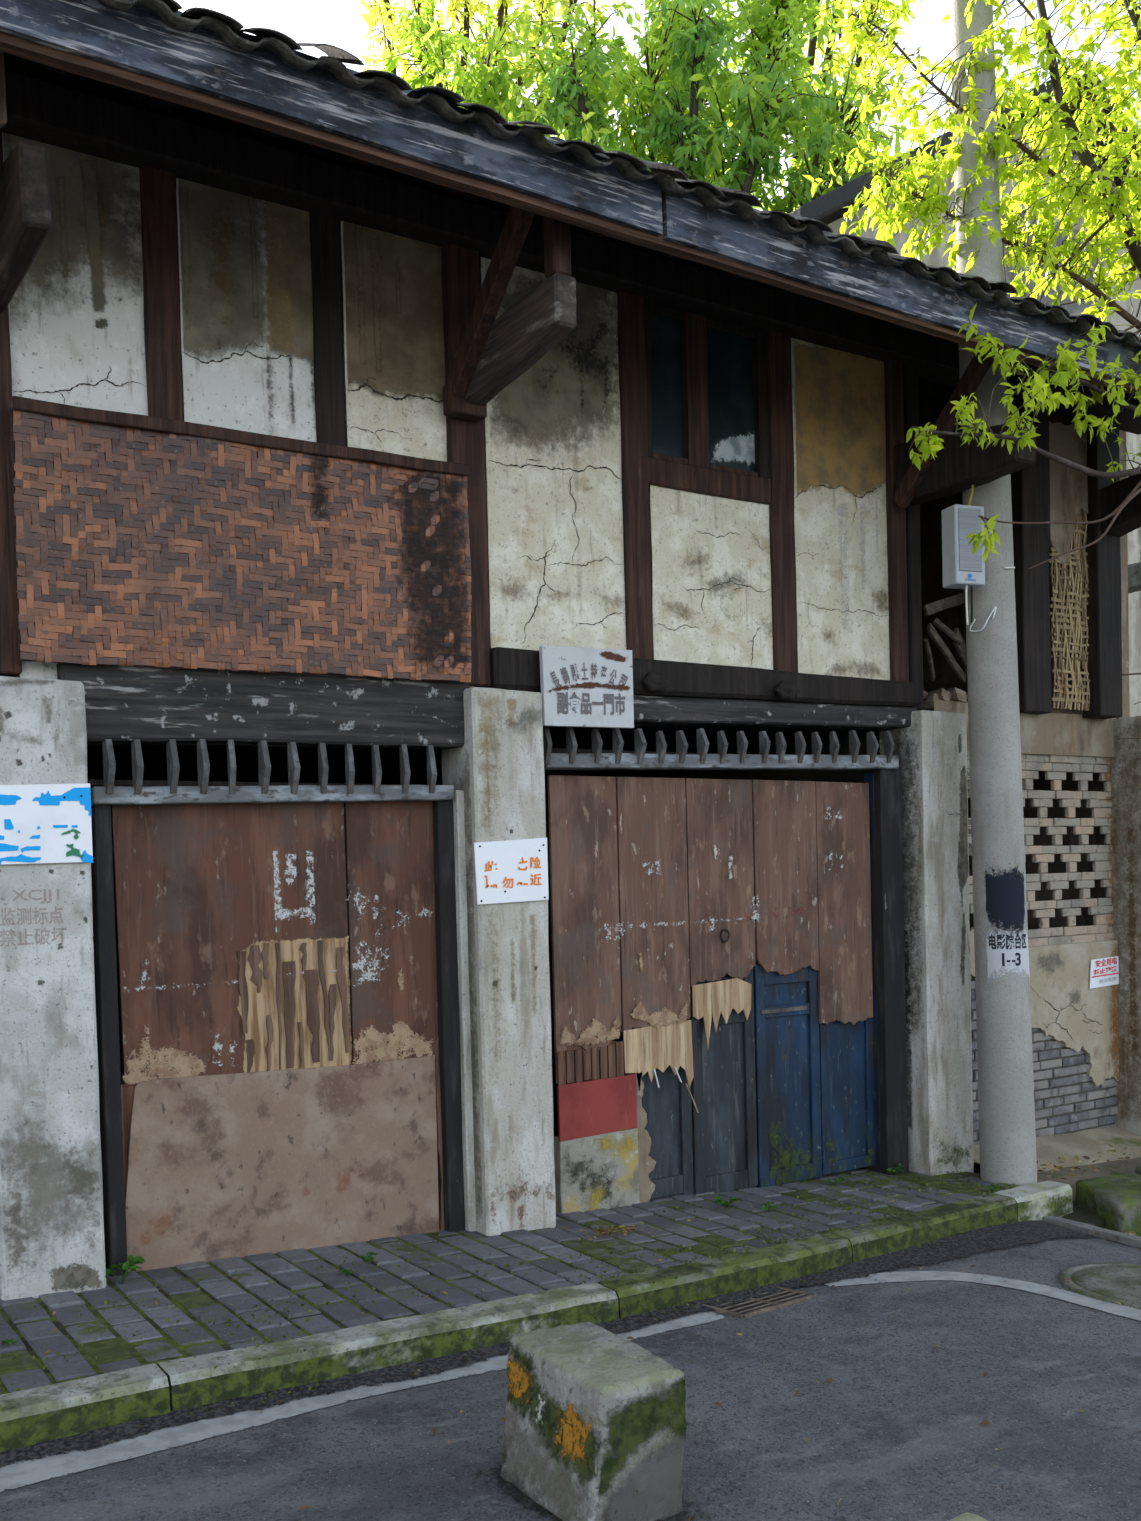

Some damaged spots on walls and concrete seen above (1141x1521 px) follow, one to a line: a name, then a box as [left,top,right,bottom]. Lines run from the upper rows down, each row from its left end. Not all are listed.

water stain [81,160,106,311]
crack [12,366,144,404]
crack [183,344,307,366]
crack [347,377,443,441]
water stain [310,457,328,518]
water stain [392,472,469,671]
crack [488,459,623,644]
peeling [122,1025,207,1084]
peeling [351,1020,434,1064]
peeling [559,1001,689,1046]
flaking render [1032,1028,1118,1137]
water stain [1,1120,100,1251]